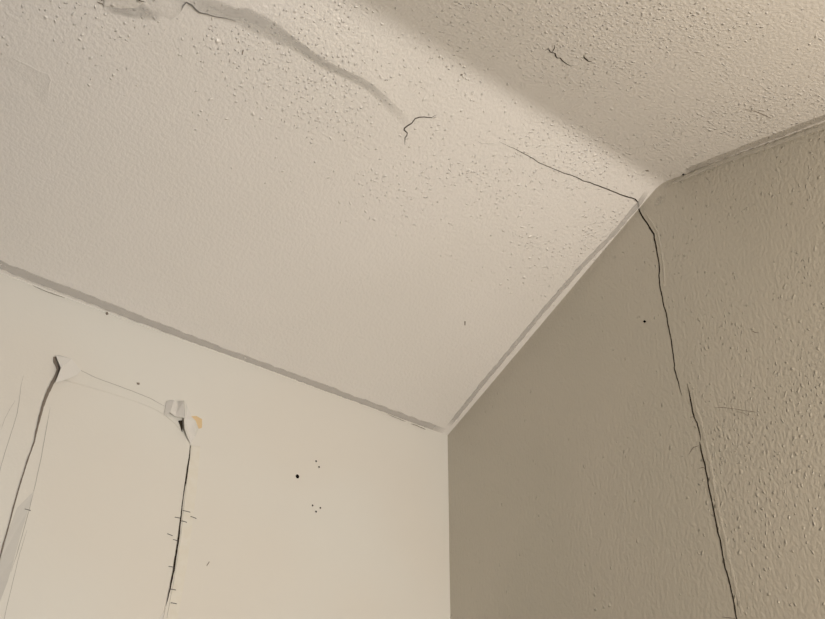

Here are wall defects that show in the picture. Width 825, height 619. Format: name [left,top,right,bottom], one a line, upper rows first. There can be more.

crack [507,145,745,619]